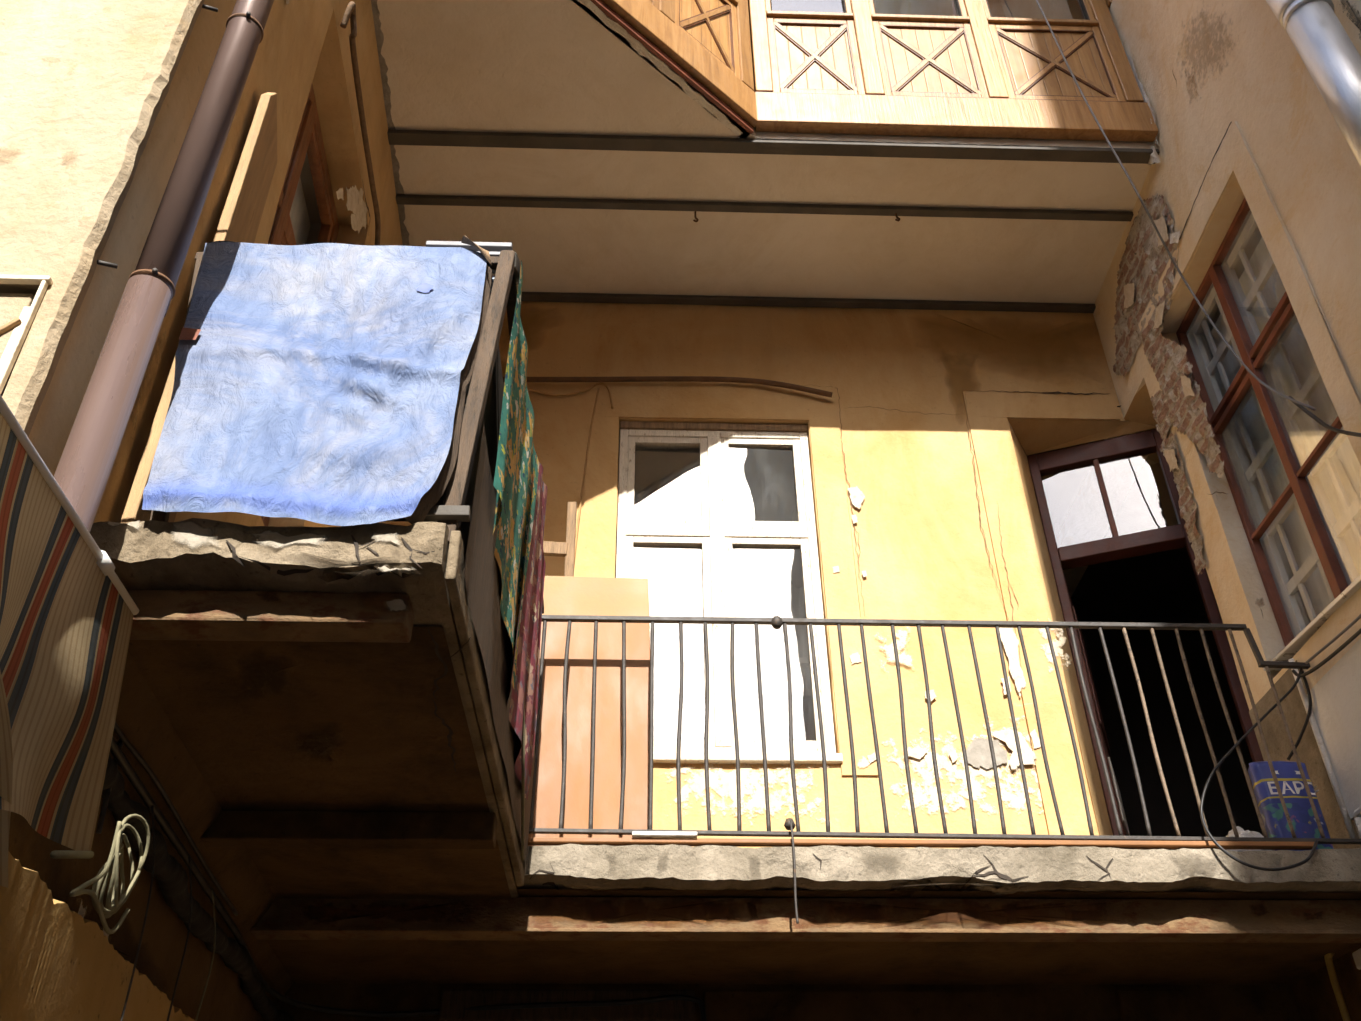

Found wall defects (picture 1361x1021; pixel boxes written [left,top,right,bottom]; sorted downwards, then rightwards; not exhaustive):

peeling [336,179,370,236]
flaking render [1113,193,1224,574]
crack [798,384,1106,671]
spalling [319,558,411,579]
peeling [999,628,1026,696]
peeling [907,746,928,759]
spalling [949,727,1041,769]
crack [961,854,1015,888]
crack [1087,856,1113,880]